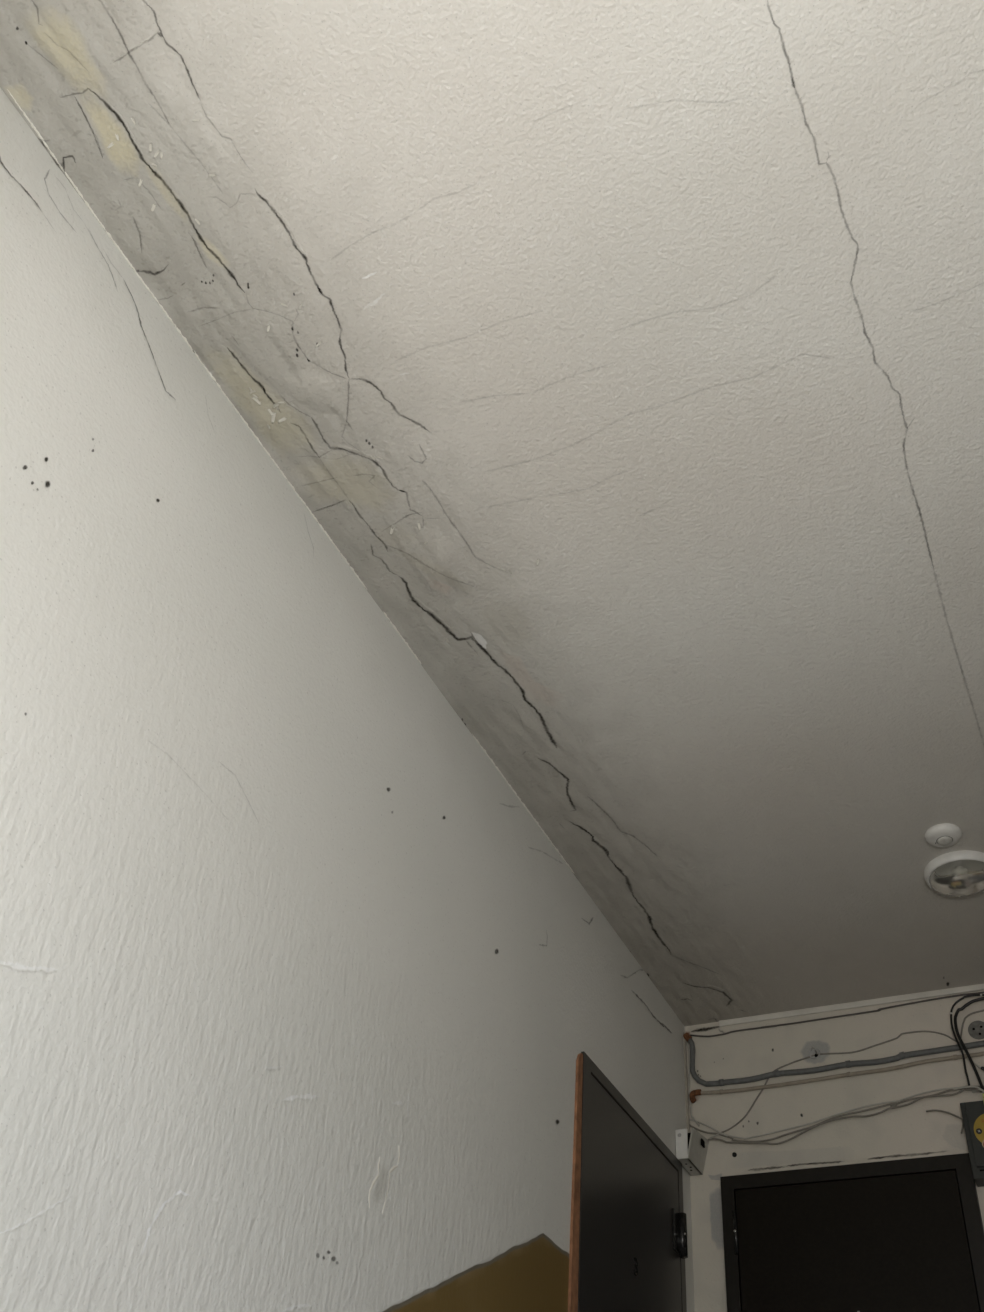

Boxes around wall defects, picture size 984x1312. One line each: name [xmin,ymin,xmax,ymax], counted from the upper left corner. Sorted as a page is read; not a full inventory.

crack [112,5,198,96]
crack [100,96,245,293]
crack [257,193,427,430]
crack [228,349,275,404]
crack [309,422,420,515]
crack [401,578,671,953]
crack [636,984,732,1032]